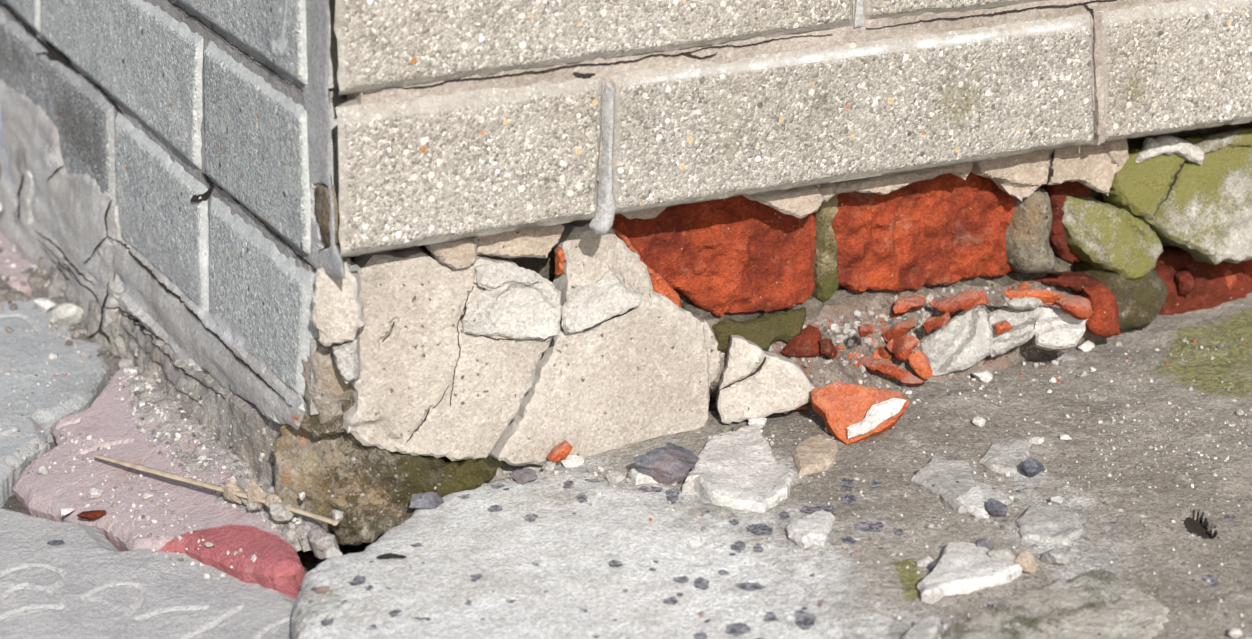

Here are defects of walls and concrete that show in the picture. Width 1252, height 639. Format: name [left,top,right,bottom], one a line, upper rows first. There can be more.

flaking render [622,207,666,219]
flaking render [743,135,1205,219]
crack [1152,161,1186,221]
crack [14,166,292,407]
spalling [301,184,367,425]
spalling [425,224,644,340]
crack [584,308,634,331]
flaking render [1003,297,1042,310]
crack [406,286,550,442]